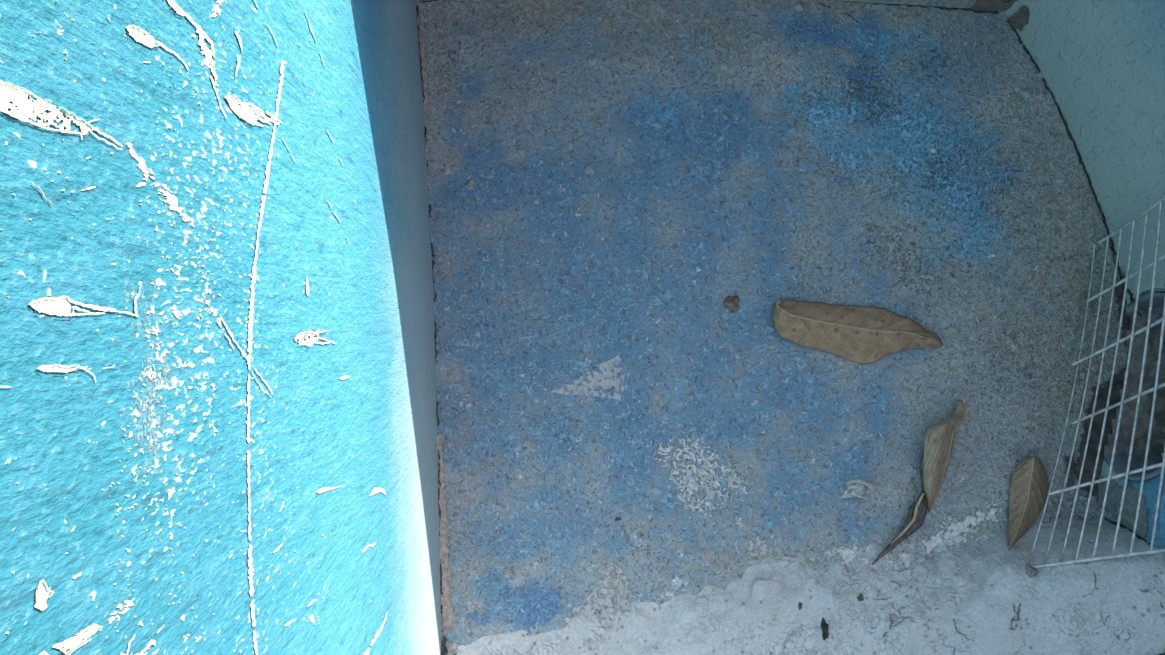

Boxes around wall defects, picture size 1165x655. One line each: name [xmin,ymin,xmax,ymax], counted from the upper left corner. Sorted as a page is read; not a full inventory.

peeling [126,0,282,126]
peeling [0,72,221,655]
peeling [293,329,348,355]
peeling [363,613,394,655]